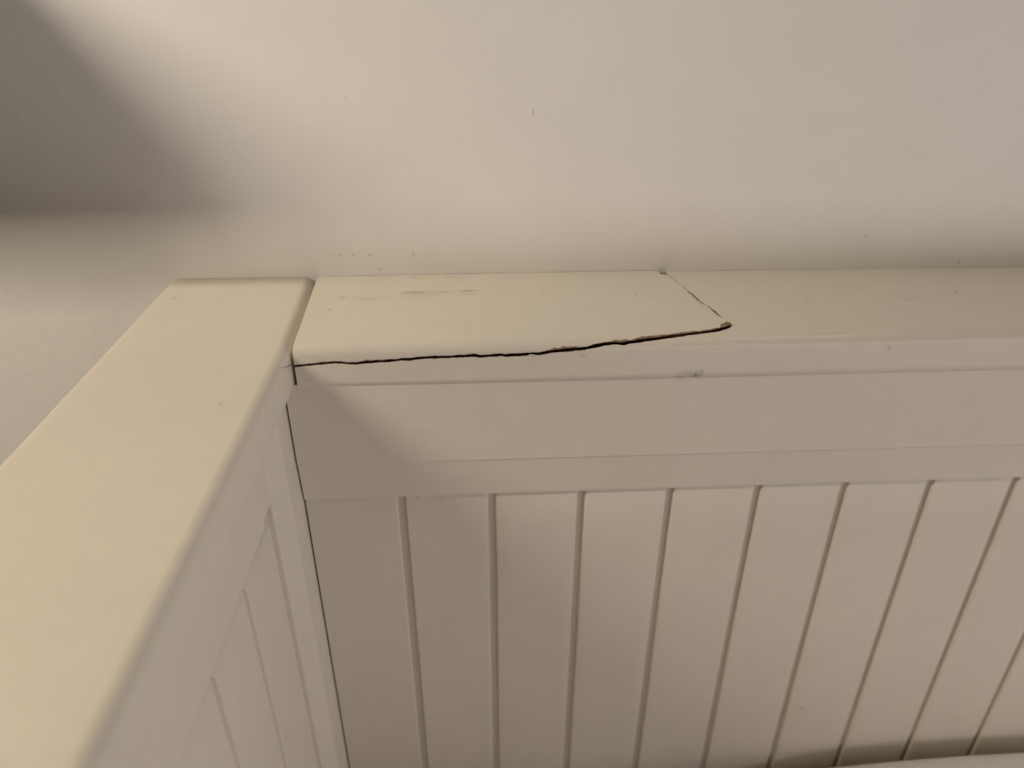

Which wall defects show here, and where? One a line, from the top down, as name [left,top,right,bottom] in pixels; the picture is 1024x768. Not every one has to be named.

crack [283,272,731,368]